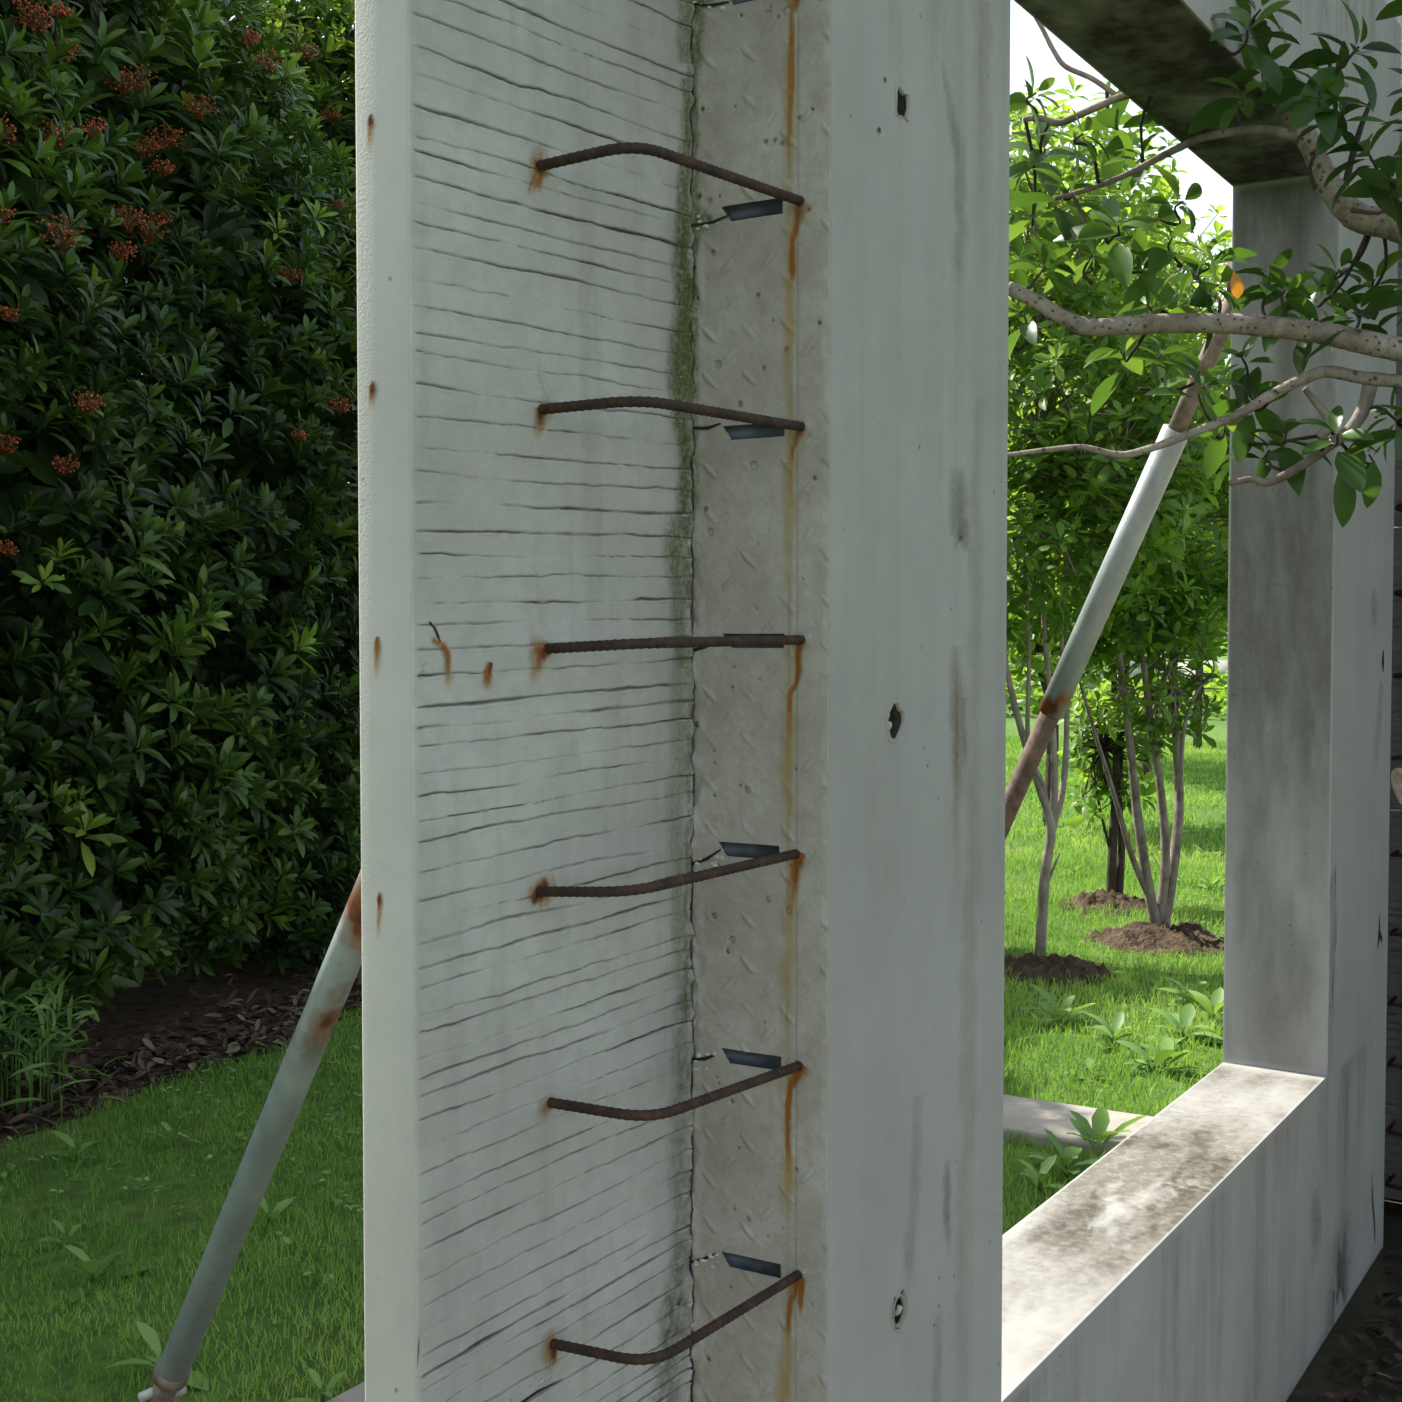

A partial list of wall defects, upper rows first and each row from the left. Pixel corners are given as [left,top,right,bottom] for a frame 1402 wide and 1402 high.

corrosion [787,0,799,146]
corrosion [787,202,809,337]
crack [690,0,731,982]
corrosion [429,622,451,674]
corrosion [484,662,493,685]
corrosion [534,643,550,670]
corrosion [787,640,806,739]
corrosion [790,852,805,904]
corrosion [785,1064,807,1184]
crack [689,1015,716,1402]
damp [1027,1119,1257,1275]
corrosion [786,1277,805,1336]